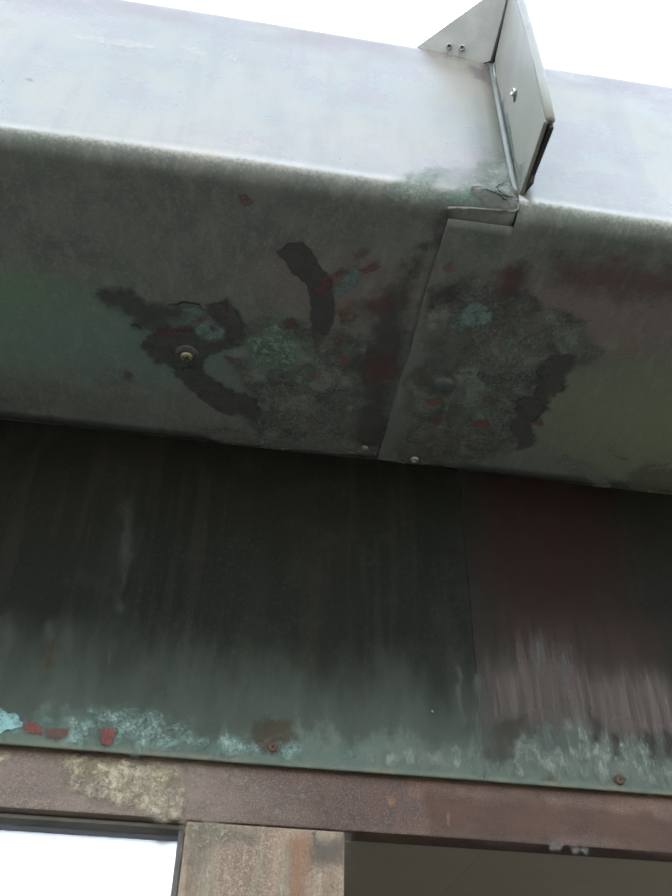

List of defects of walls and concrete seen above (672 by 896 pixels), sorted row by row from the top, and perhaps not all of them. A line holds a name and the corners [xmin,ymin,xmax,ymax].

peeling [277,243,348,336]
peeling [99,290,261,418]
peeling [0,711,68,738]
leakage [58,709,303,759]
leakage [373,641,672,788]